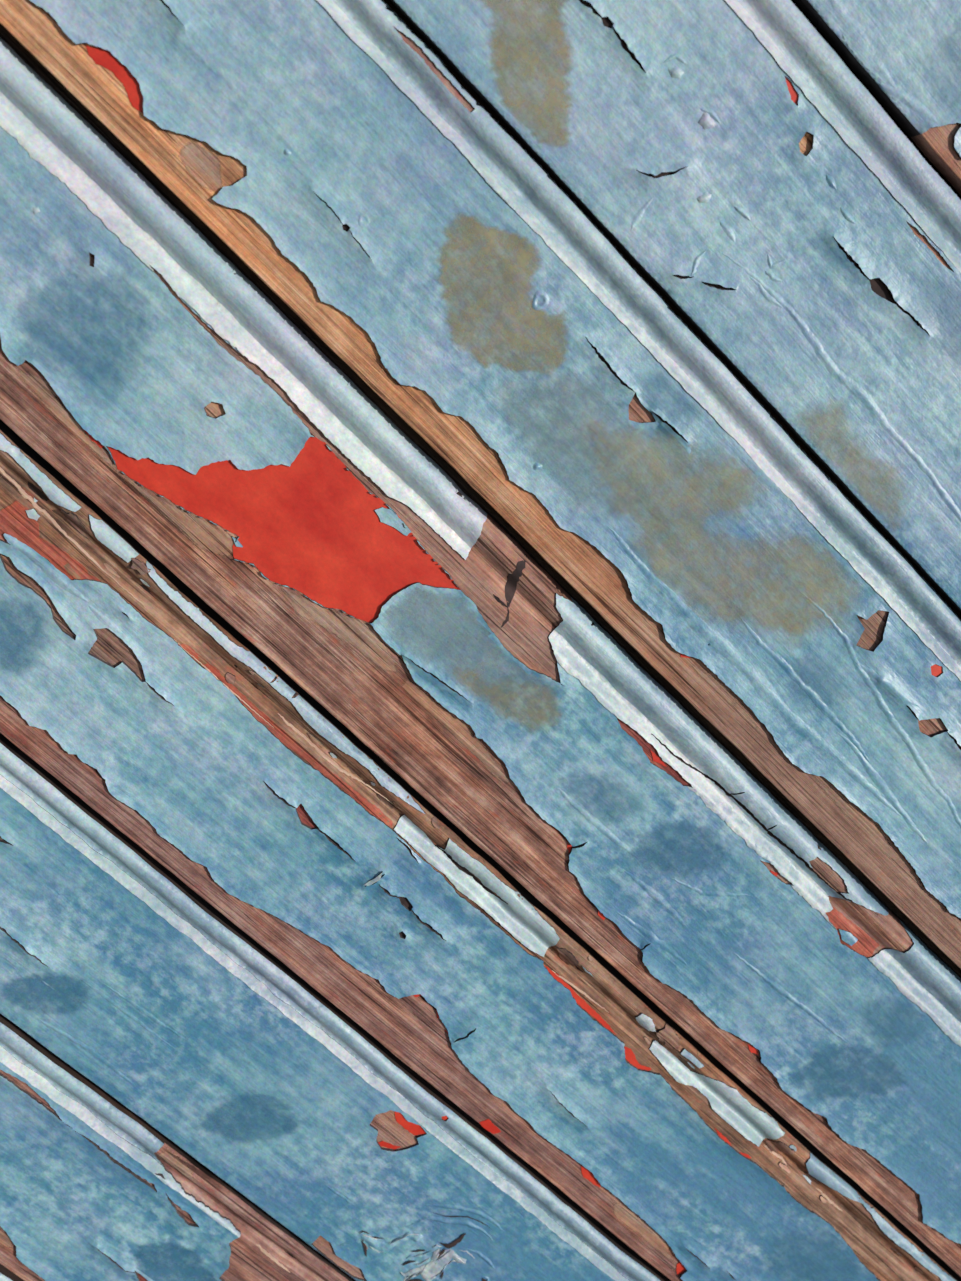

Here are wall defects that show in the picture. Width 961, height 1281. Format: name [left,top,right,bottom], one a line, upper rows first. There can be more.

leakage [487,0,569,143]
leakage [441,218,564,370]
peeling [0,0,961,969]